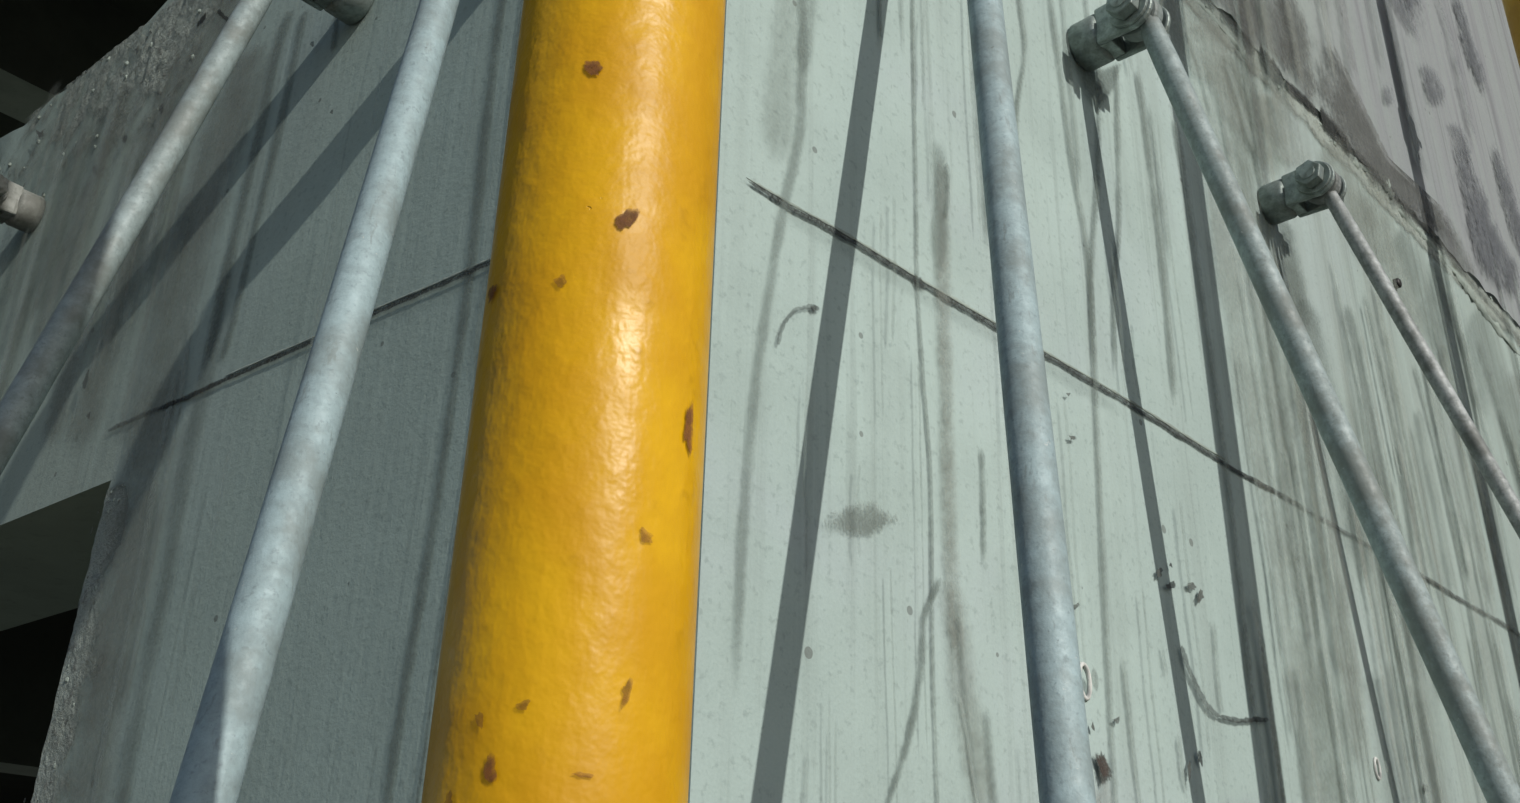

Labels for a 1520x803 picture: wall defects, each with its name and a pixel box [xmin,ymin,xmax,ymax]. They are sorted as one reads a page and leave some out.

damp [165,18,305,352]
damp [1063,65,1121,443]
damp [1220,0,1520,295]
damp [892,272,954,791]
damp [1294,379,1335,625]
damp [1417,374,1483,587]
crack [1181,646,1268,723]
damp [1246,655,1285,801]
damp [1385,580,1443,803]